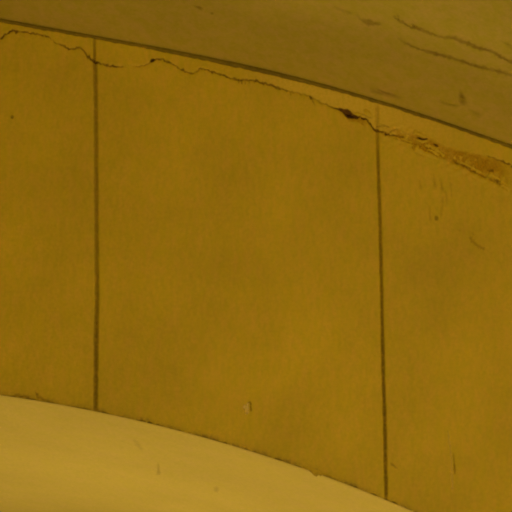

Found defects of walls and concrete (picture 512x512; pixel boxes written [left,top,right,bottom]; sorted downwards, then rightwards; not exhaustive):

crack [355,116,399,136]